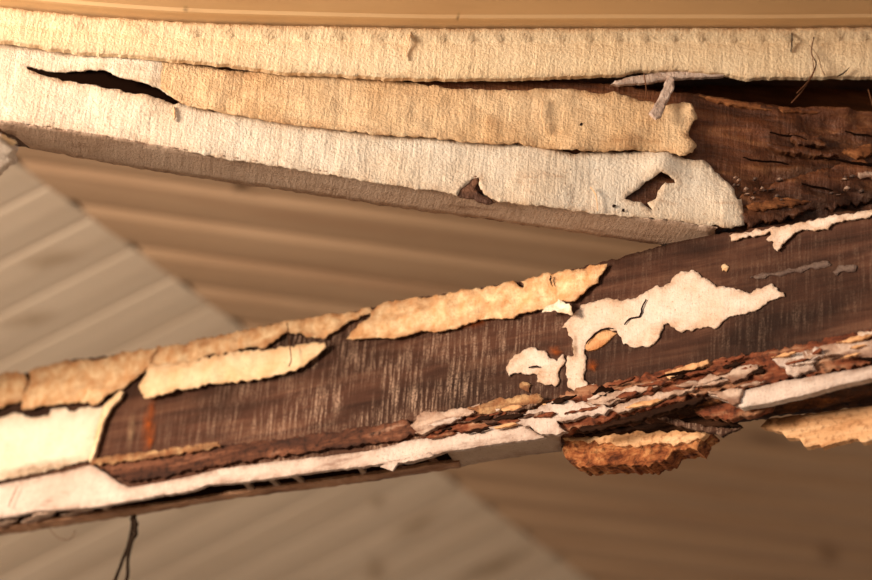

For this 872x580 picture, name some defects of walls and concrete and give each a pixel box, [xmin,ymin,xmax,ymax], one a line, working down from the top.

crack [770,132,807,140]
crack [845,129,872,137]
peeling [0,44,872,251]
crack [743,157,789,165]
crack [818,157,872,166]
crack [801,183,833,191]
peeling [0,261,872,481]